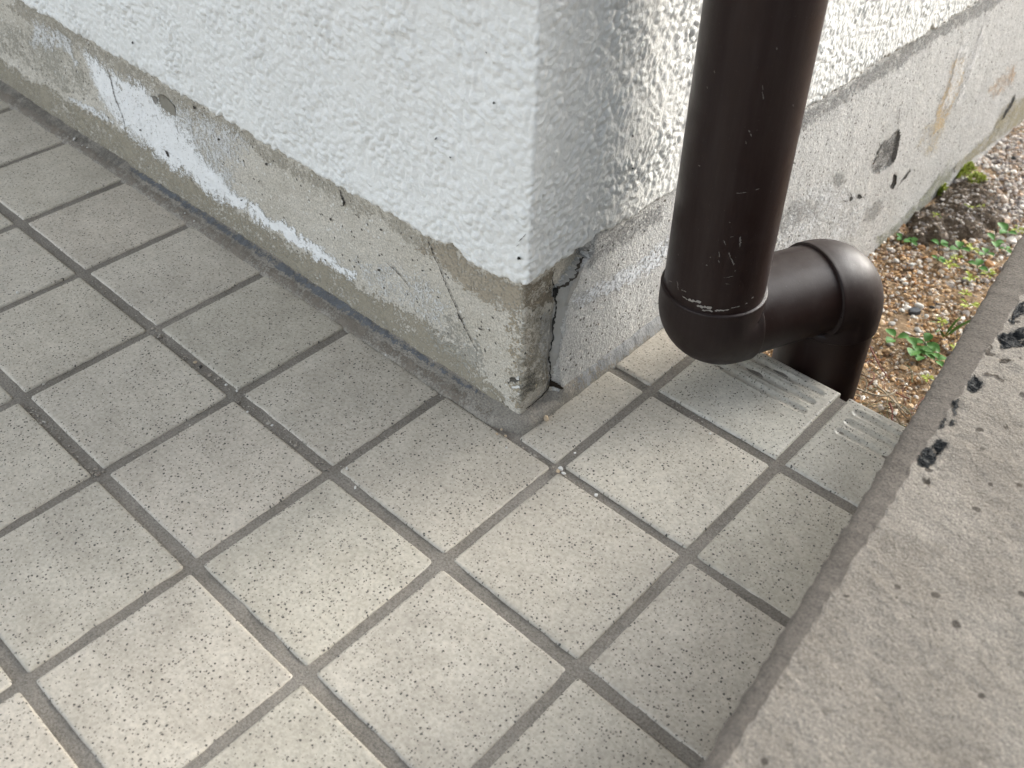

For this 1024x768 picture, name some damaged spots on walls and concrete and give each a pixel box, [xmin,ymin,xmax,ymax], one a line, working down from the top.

water stain [0,0,555,425]
crack [428,242,477,351]
crack [526,257,584,409]